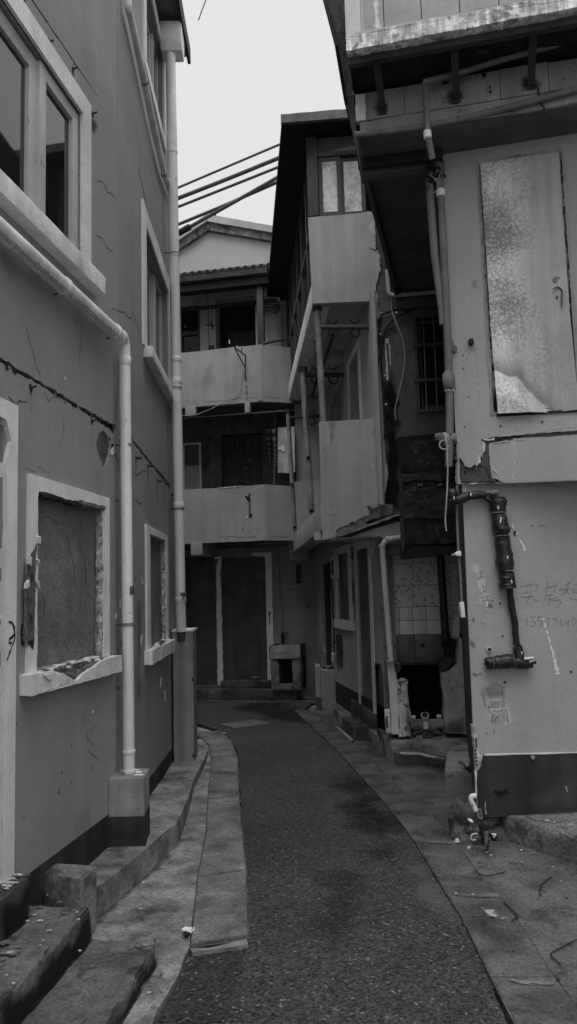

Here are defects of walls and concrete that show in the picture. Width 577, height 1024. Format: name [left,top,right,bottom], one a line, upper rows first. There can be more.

spalling [453,421,577,492]